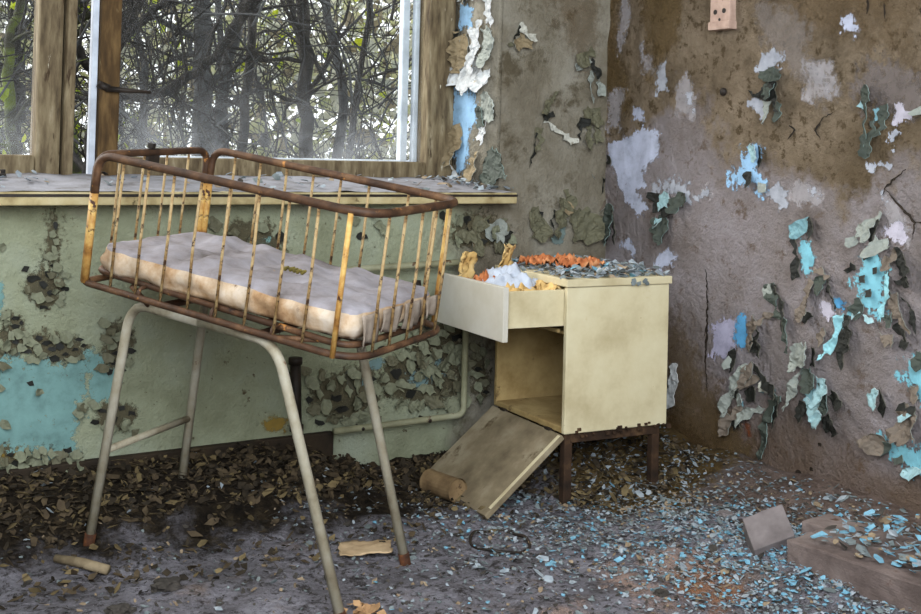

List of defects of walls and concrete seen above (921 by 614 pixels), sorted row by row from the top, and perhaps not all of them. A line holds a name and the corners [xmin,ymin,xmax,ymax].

peeling [18,208,71,311]
peeling [208,215,289,253]
peeling [405,0,514,190]
peeling [508,22,538,52]
spalling [511,45,710,286]
peeling [726,143,789,211]
peeling [747,47,786,124]
peeling [856,84,921,174]
crack [882,169,921,240]
peeling [0,281,140,474]
peeling [301,315,492,427]
peeling [342,191,921,614]